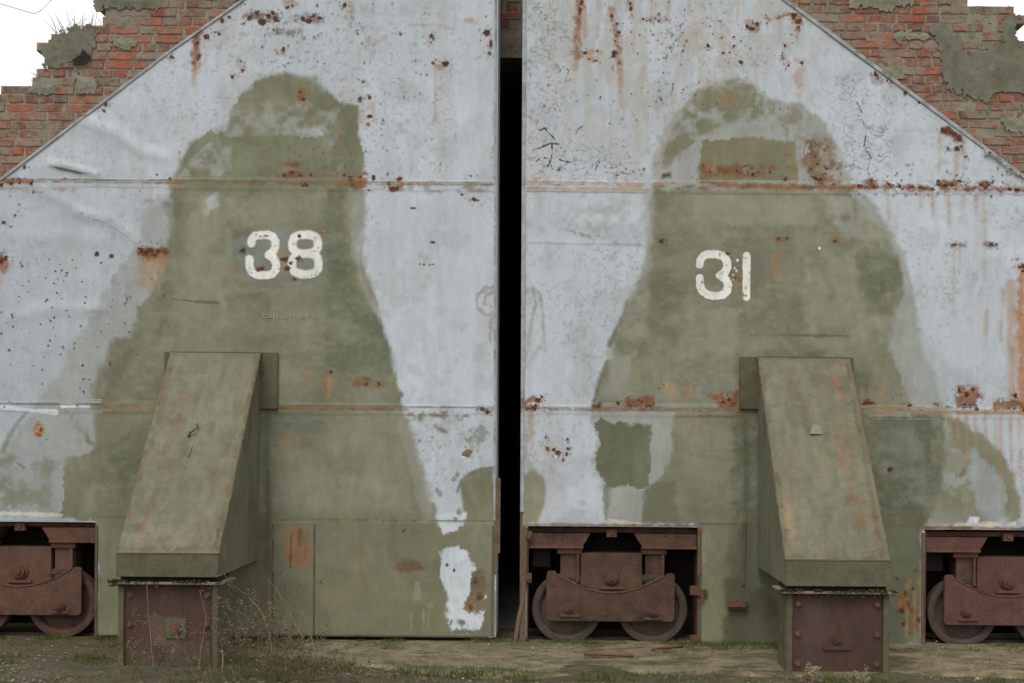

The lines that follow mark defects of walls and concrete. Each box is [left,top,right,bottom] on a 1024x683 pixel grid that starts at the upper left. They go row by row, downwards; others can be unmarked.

peeling [93,0,163,12]
peeling [849,0,914,12]
peeling [27,24,100,95]
peeling [110,34,137,50]
crack [525,0,640,188]
peeling [893,13,1024,103]
rust [525,0,1024,306]
rust [131,242,177,294]
rust [524,378,743,463]
rust [858,254,1024,531]
rust [277,523,327,574]
peeling [448,564,489,635]